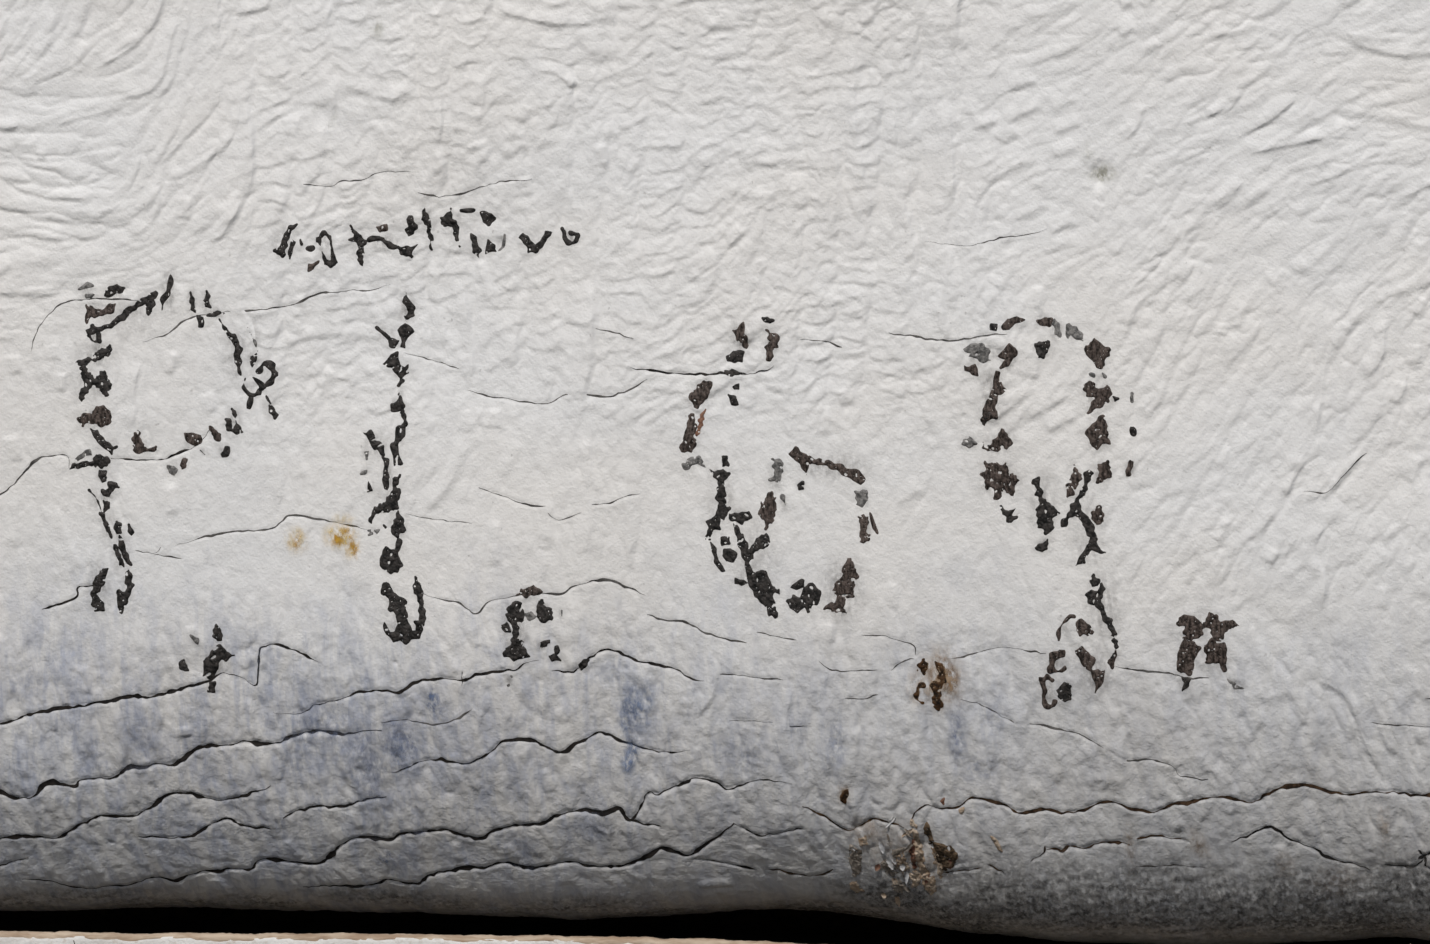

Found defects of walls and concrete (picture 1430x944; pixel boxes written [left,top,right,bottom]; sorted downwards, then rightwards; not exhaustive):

rust [334,529,357,553]
rust [913,657,956,711]
crack [0,578,1430,891]